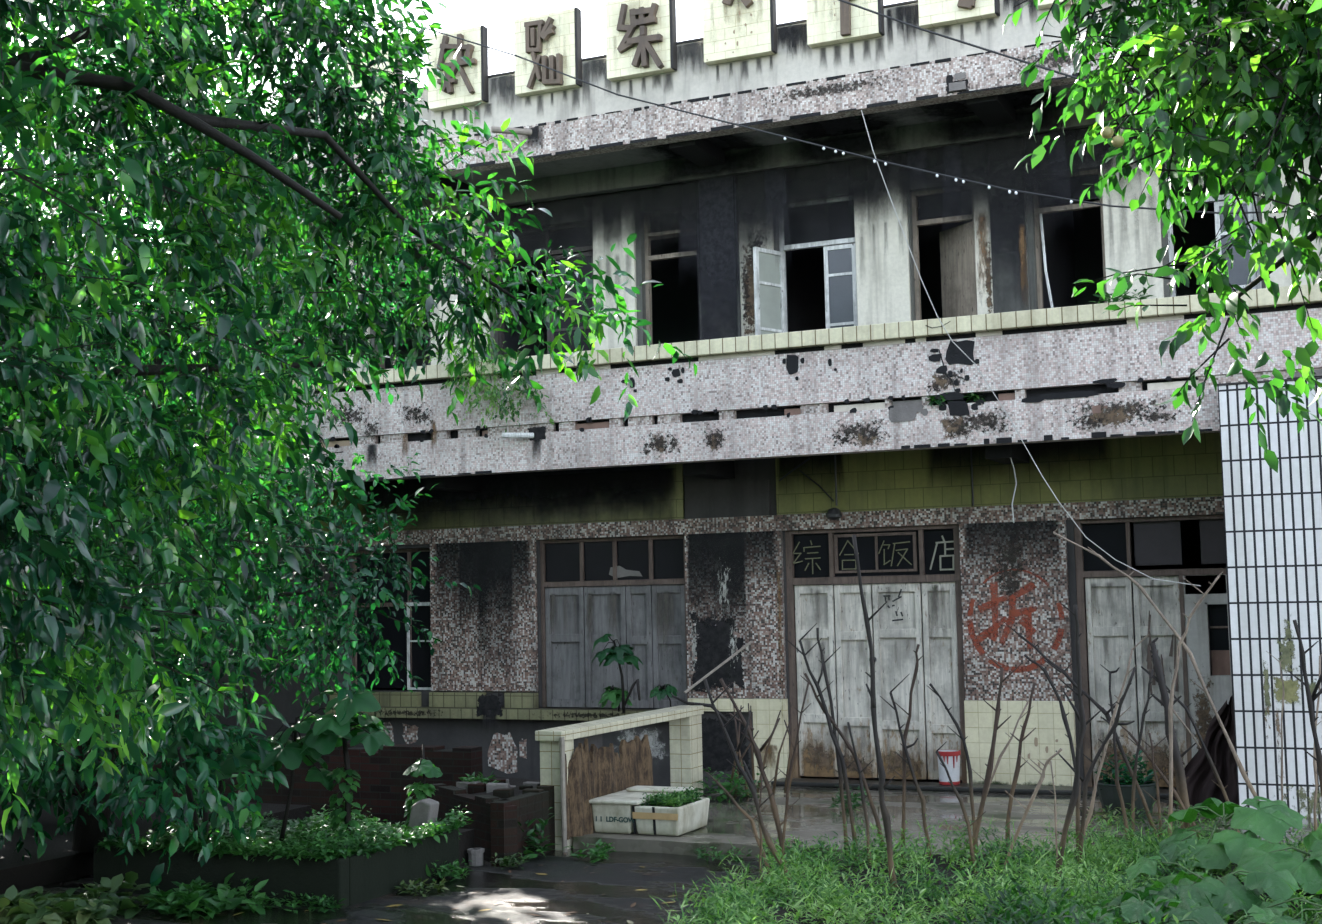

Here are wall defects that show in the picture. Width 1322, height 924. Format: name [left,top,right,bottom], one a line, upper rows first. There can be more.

water stain [441,4,994,120]
water stain [483,50,1159,340]
spalling [782,355,804,381]
spalling [888,340,984,422]
water stain [365,430,680,526]
water stain [779,416,904,479]
water stain [930,395,1185,472]
water stain [436,540,528,620]
water stain [688,531,775,668]
spalling [689,610,748,693]